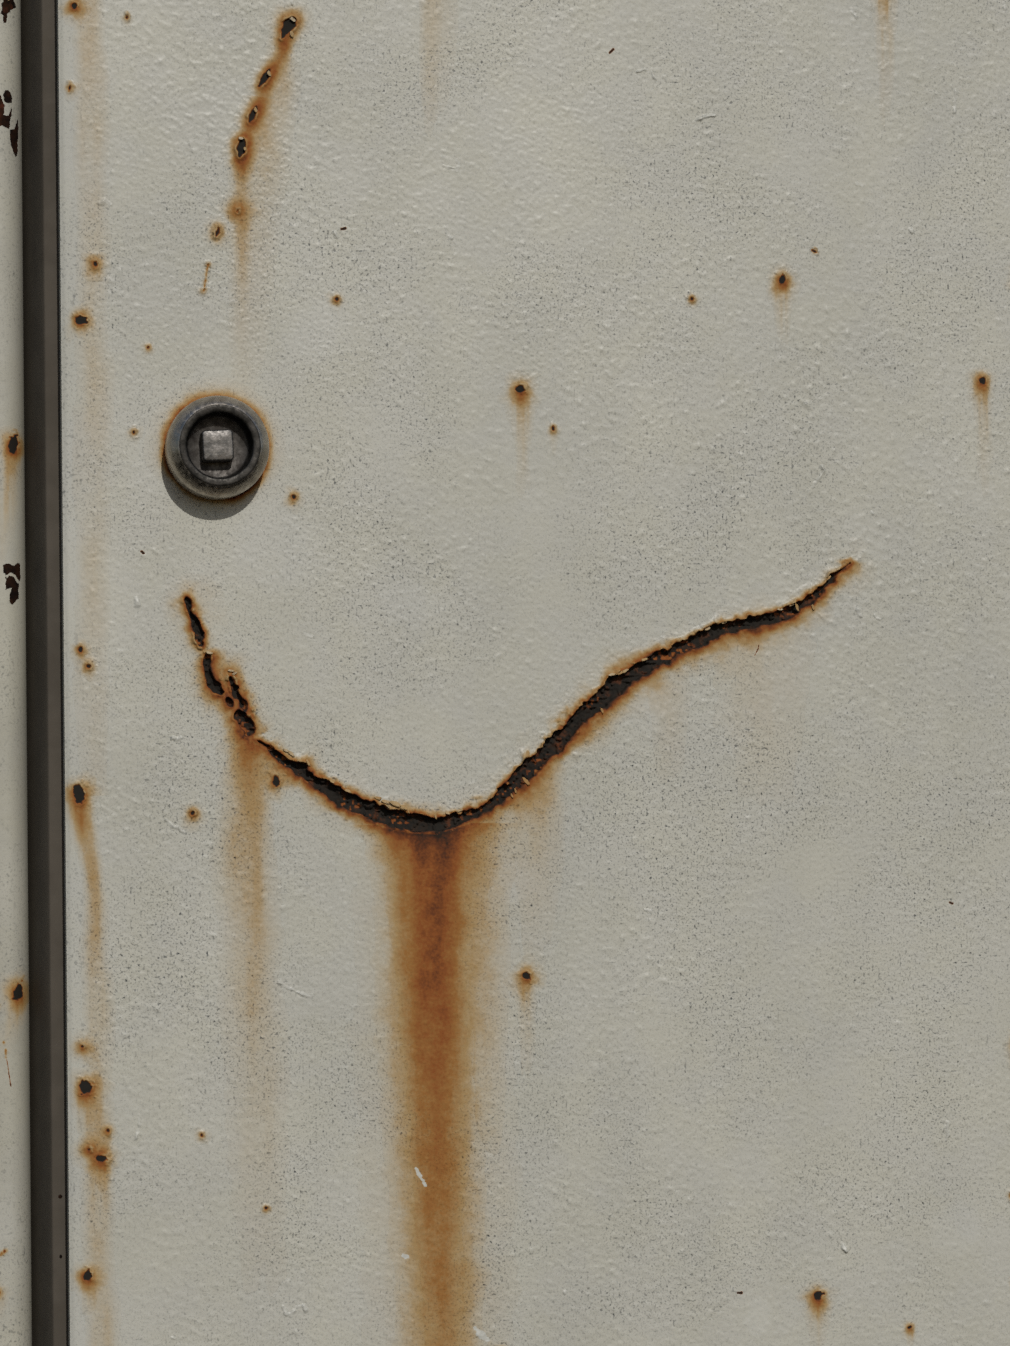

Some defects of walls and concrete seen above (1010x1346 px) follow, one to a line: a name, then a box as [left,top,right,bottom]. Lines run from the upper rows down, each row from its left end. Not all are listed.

peeling [1,0,16,23]
peeling [0,90,19,157]
corrosion [765,259,802,351]
corrosion [497,367,563,500]
peeling [3,563,21,605]
corrosion [58,0,307,1346]
crack [157,537,878,842]
corrosion [0,966,29,1063]
corrosion [344,755,568,1346]
corrosion [795,1278,842,1346]